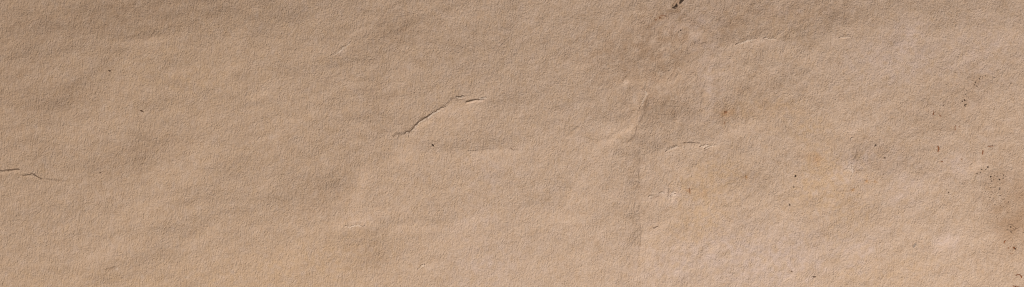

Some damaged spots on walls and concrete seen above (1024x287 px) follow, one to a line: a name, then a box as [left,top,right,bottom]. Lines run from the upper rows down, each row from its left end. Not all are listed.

crack [393,96,487,141]
crack [0,169,43,182]